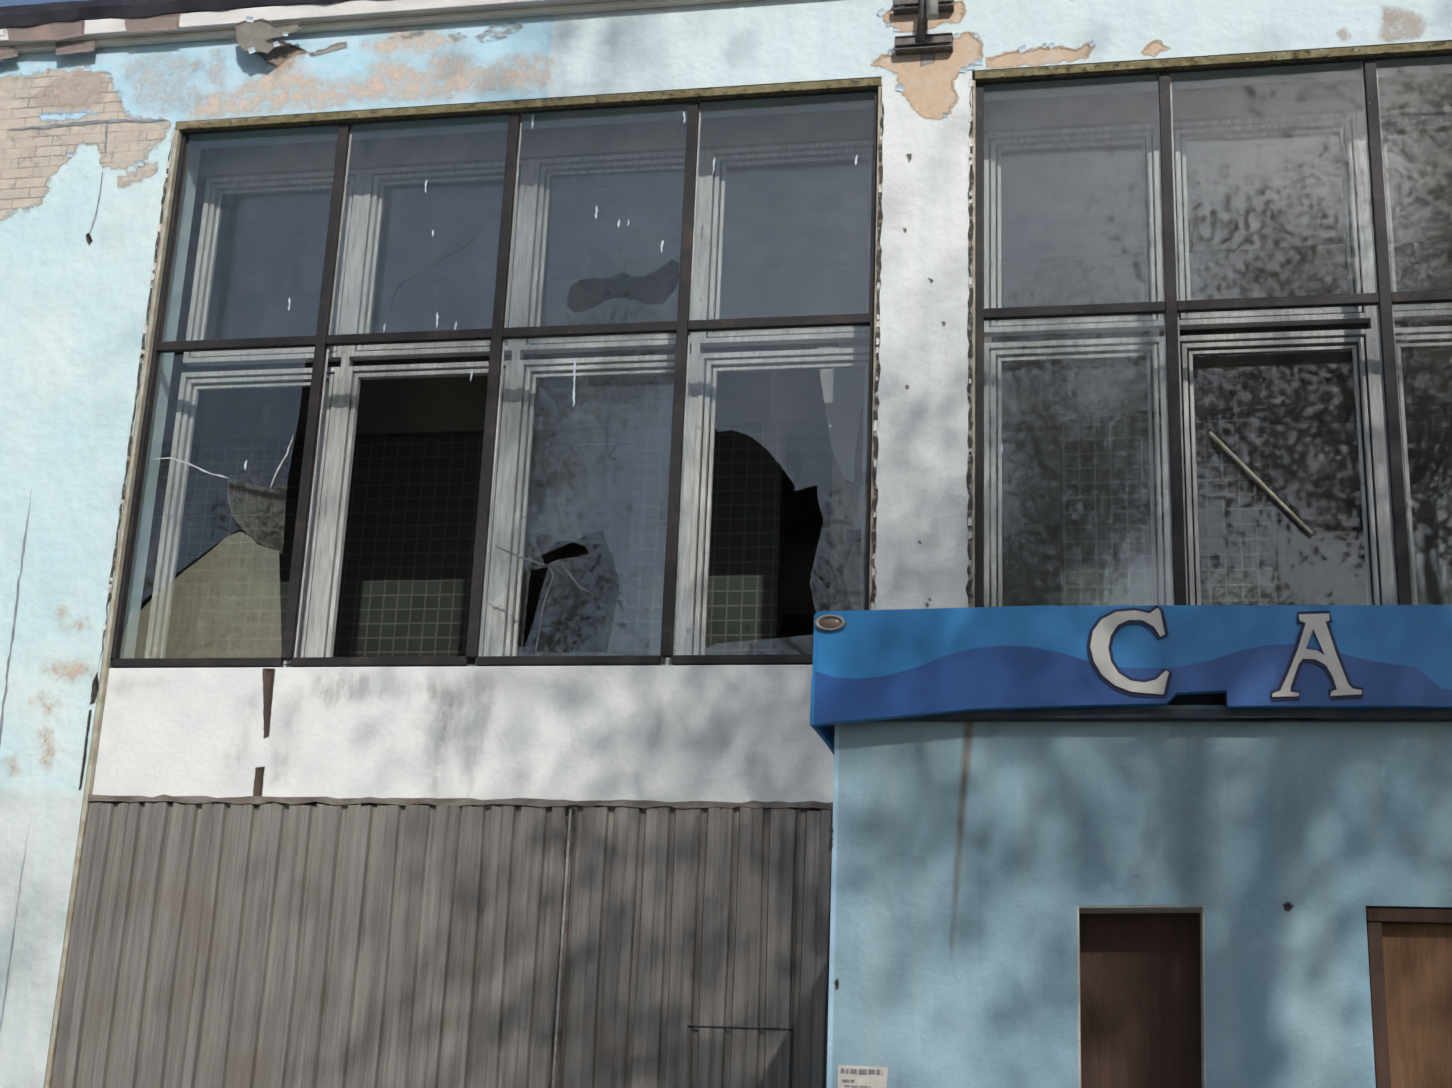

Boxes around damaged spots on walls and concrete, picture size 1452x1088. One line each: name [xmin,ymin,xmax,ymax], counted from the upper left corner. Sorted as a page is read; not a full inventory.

peeling [1142,39,1170,57]
peeling [1382,9,1422,41]
peeling [0,20,549,790]
spalling [870,0,1096,610]
crack [0,490,32,745]
crack [0,813,31,1031]